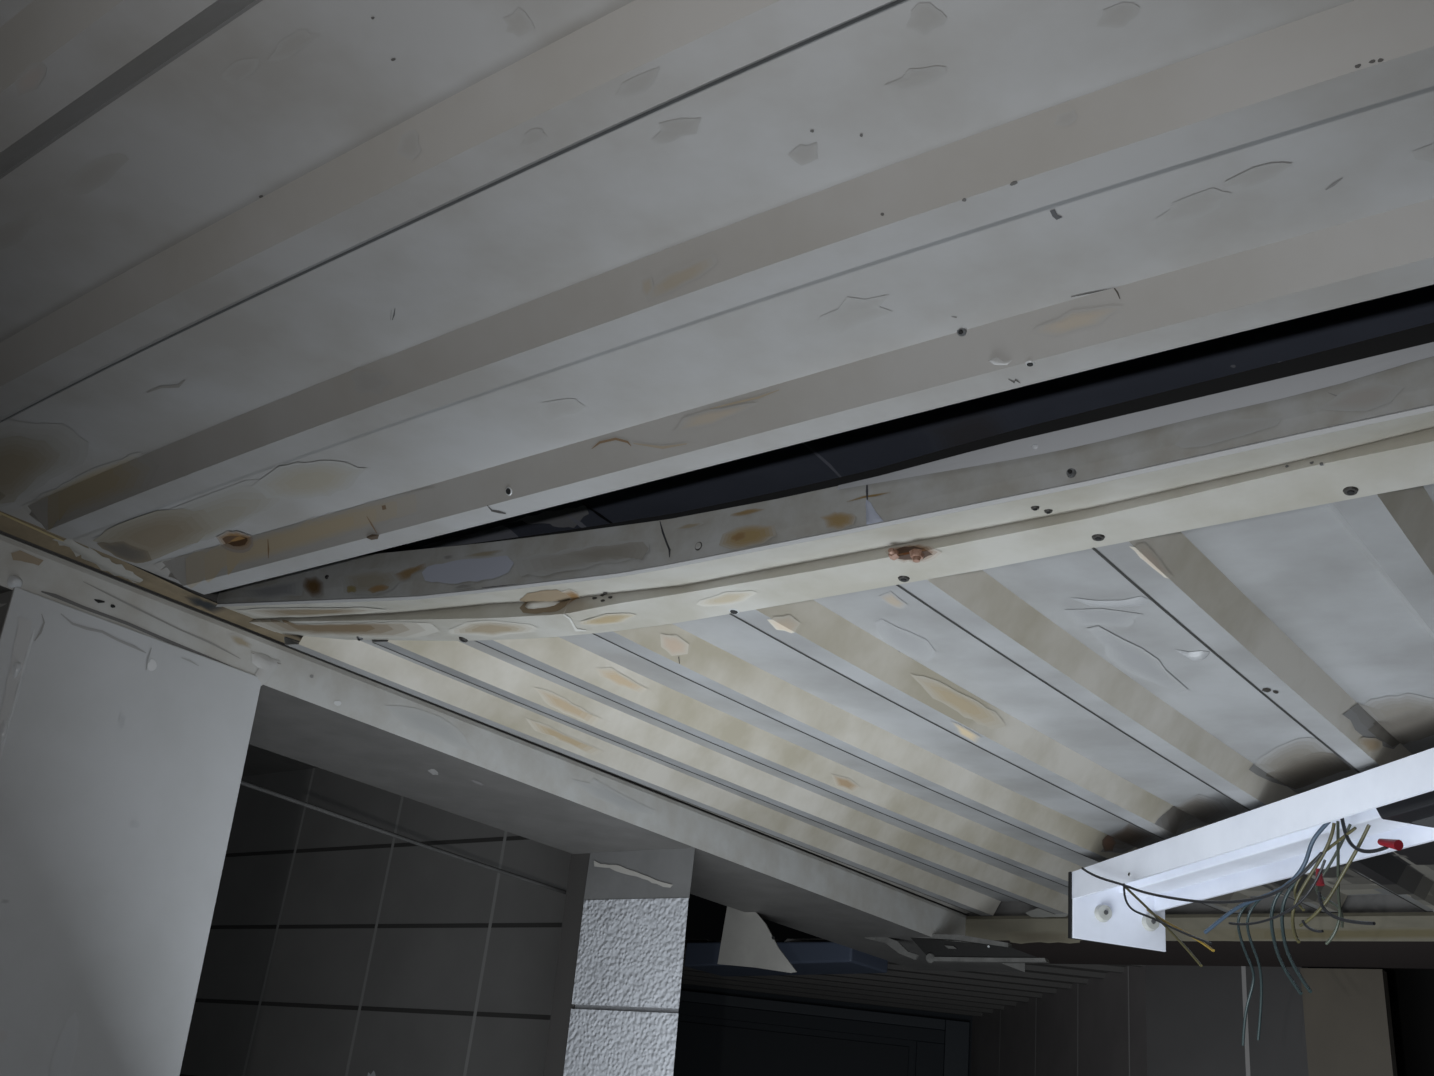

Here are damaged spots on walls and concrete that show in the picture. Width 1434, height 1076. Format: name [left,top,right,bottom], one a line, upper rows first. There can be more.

leakage [0,419,159,531]
rust [216,531,269,558]
leakage [92,461,538,650]
rust [719,508,777,550]
rust [885,544,942,563]
leakage [1350,696,1434,747]
leakage [1255,741,1351,789]